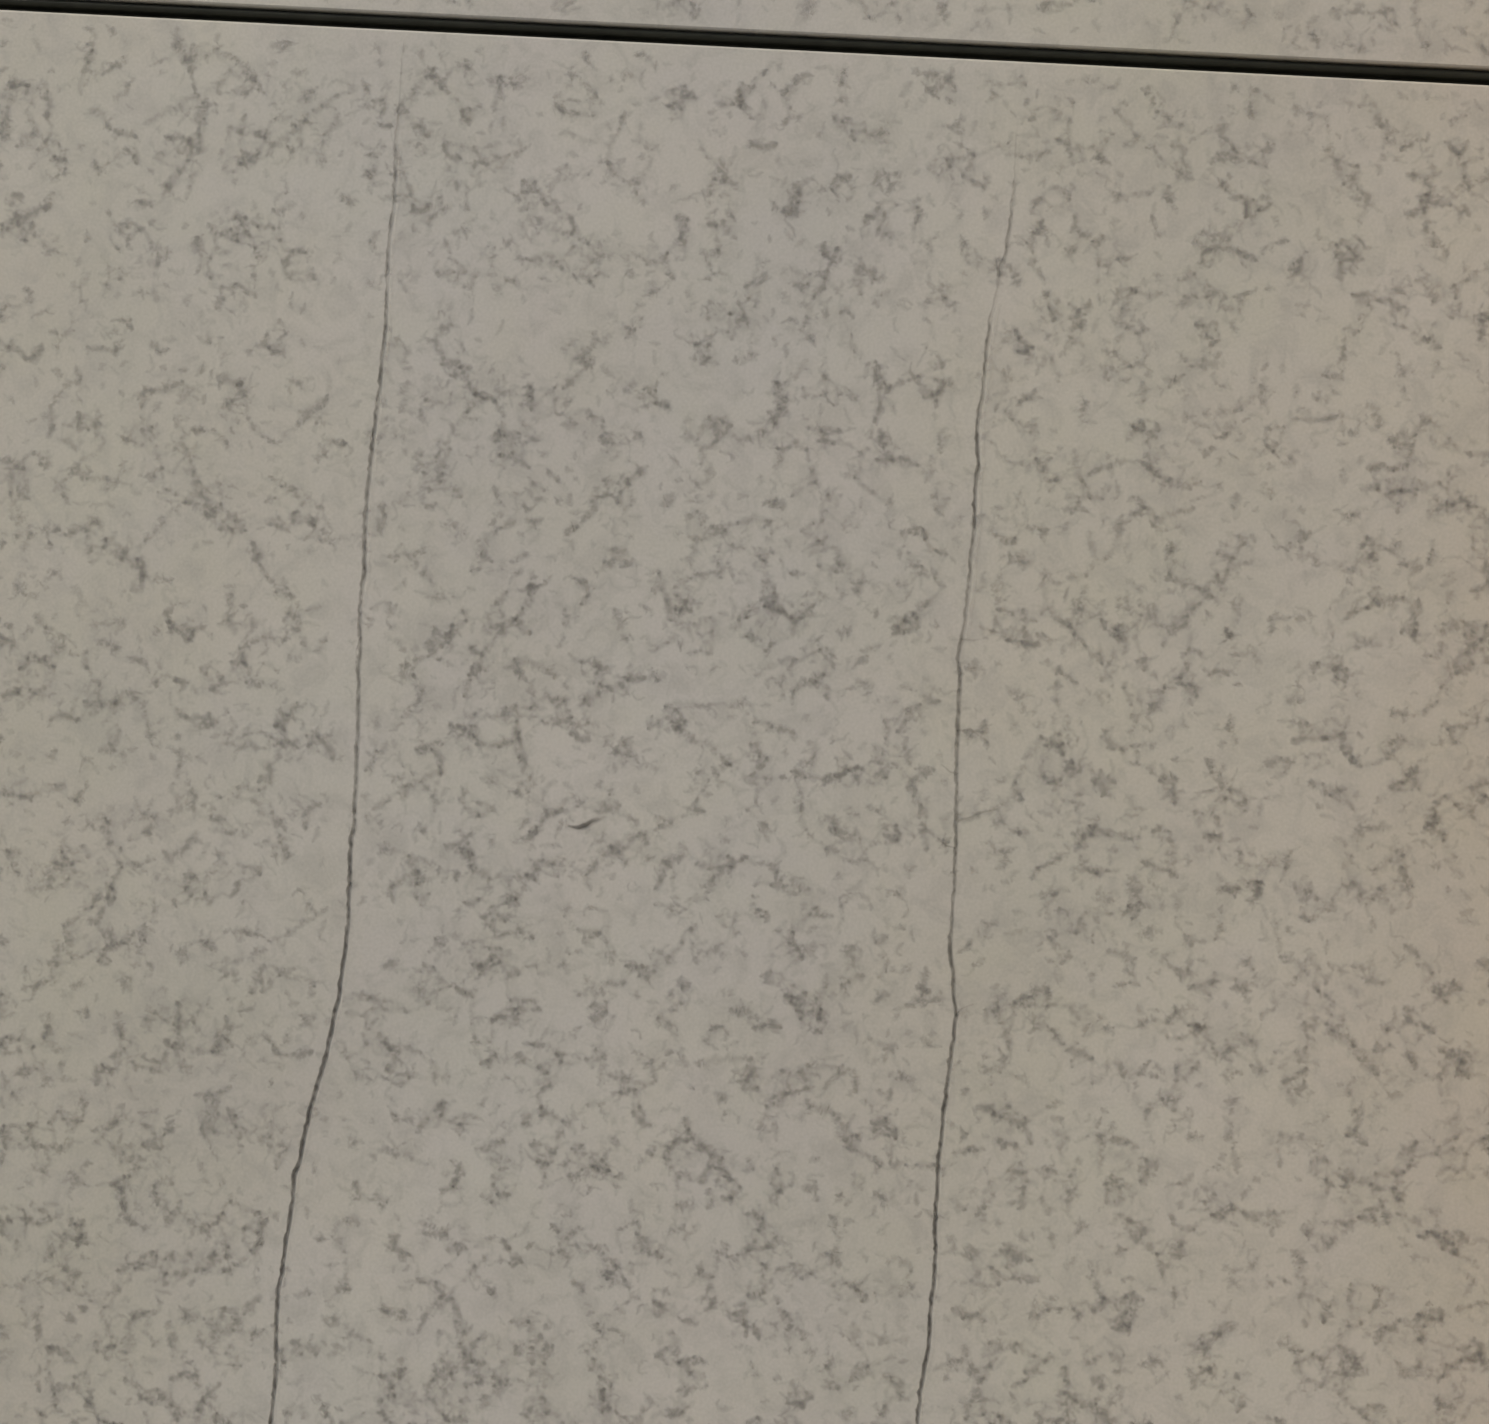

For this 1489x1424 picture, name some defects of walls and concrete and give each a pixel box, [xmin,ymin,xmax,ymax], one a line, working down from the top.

crack [369,255,388,462]
crack [969,338,988,568]
crack [268,809,355,1424]
crack [915,937,957,1423]